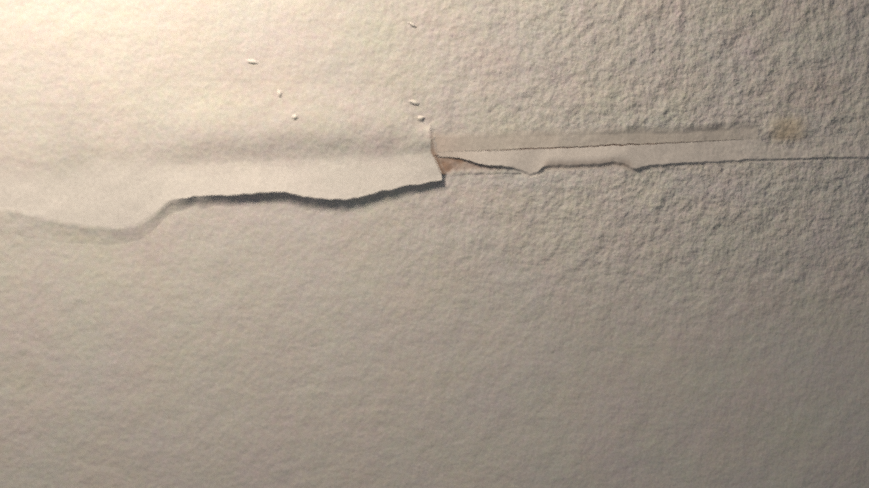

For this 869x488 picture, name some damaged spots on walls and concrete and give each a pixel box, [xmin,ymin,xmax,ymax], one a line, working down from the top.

crack [462,139,735,152]